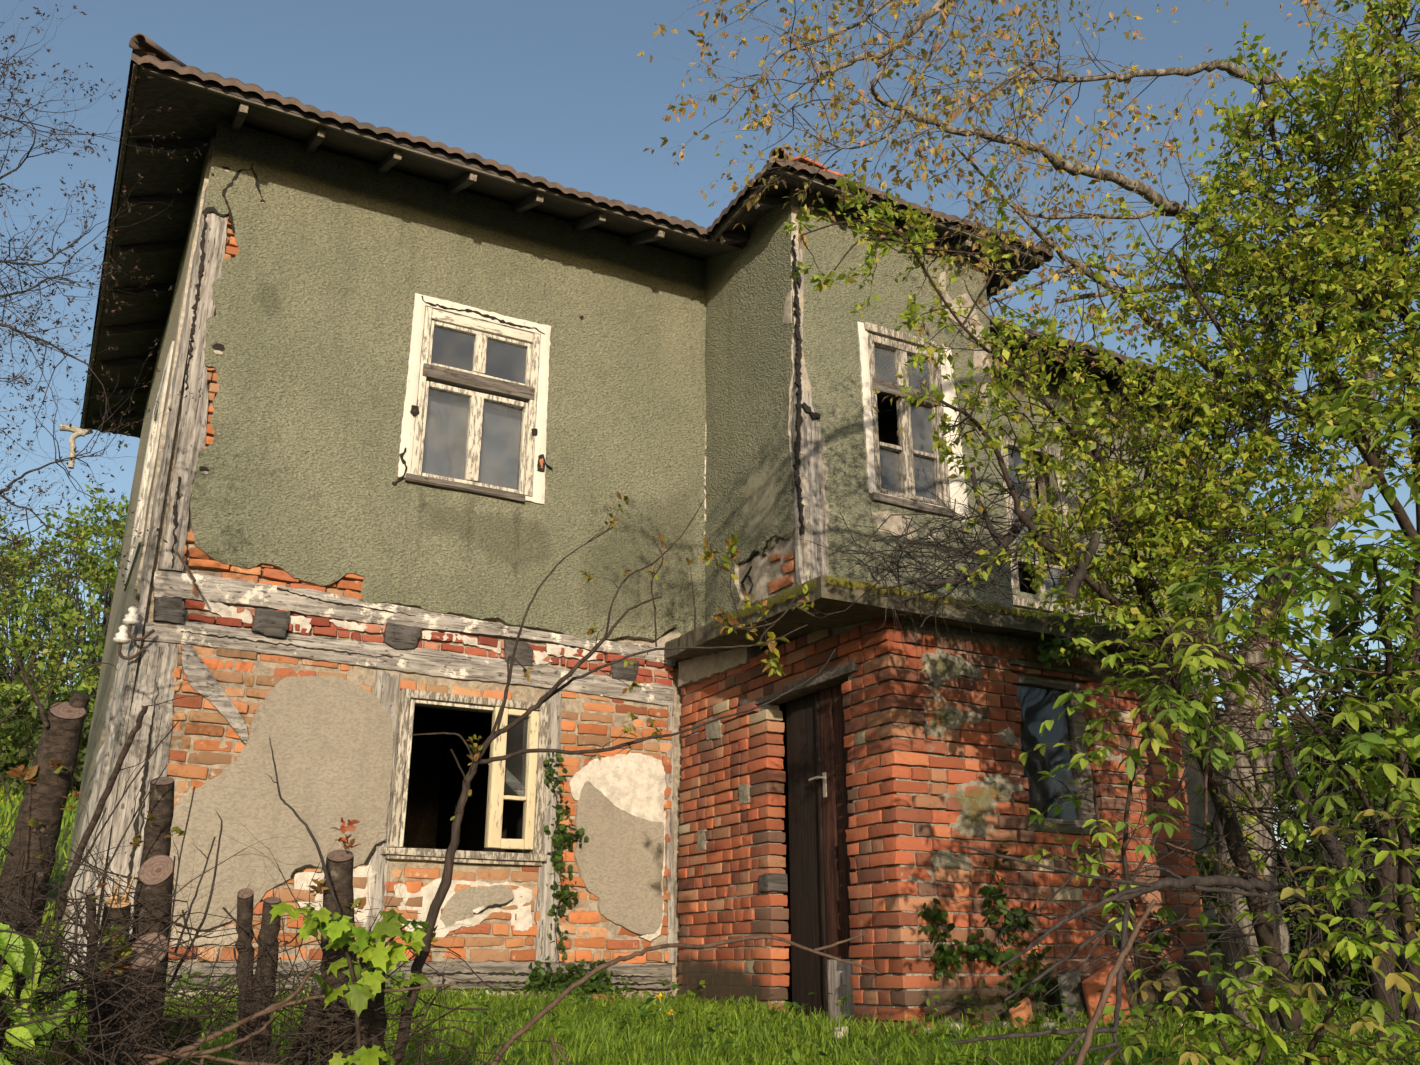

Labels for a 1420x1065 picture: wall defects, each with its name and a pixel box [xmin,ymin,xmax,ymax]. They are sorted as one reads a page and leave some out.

flaking render [212,343,225,355]
crack [185,164,264,390]
flaking render [783,290,804,326]
flaking render [739,343,831,603]